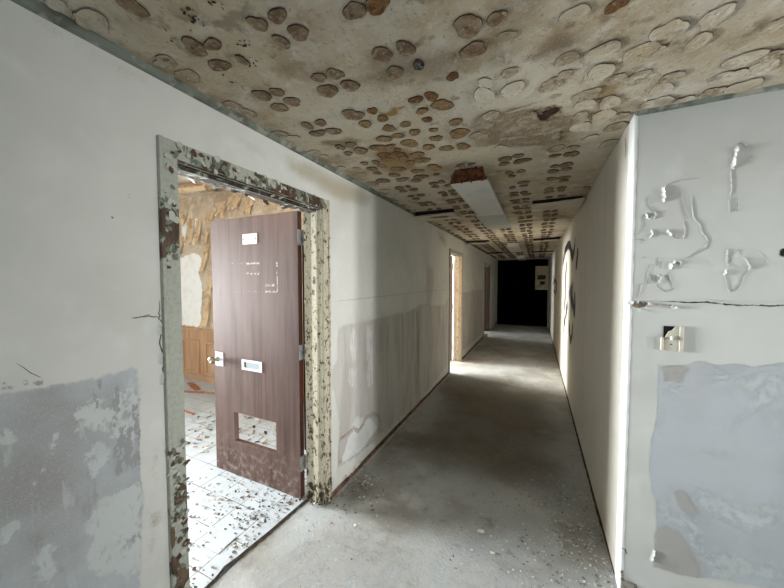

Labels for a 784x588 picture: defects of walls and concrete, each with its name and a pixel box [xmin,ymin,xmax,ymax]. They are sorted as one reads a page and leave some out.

peeling [634,178,698,243]
peeling [627,191,709,313]
peeling [728,142,747,213]
crack [134,300,165,385]
crack [662,299,784,307]
peeling [299,273,448,508]